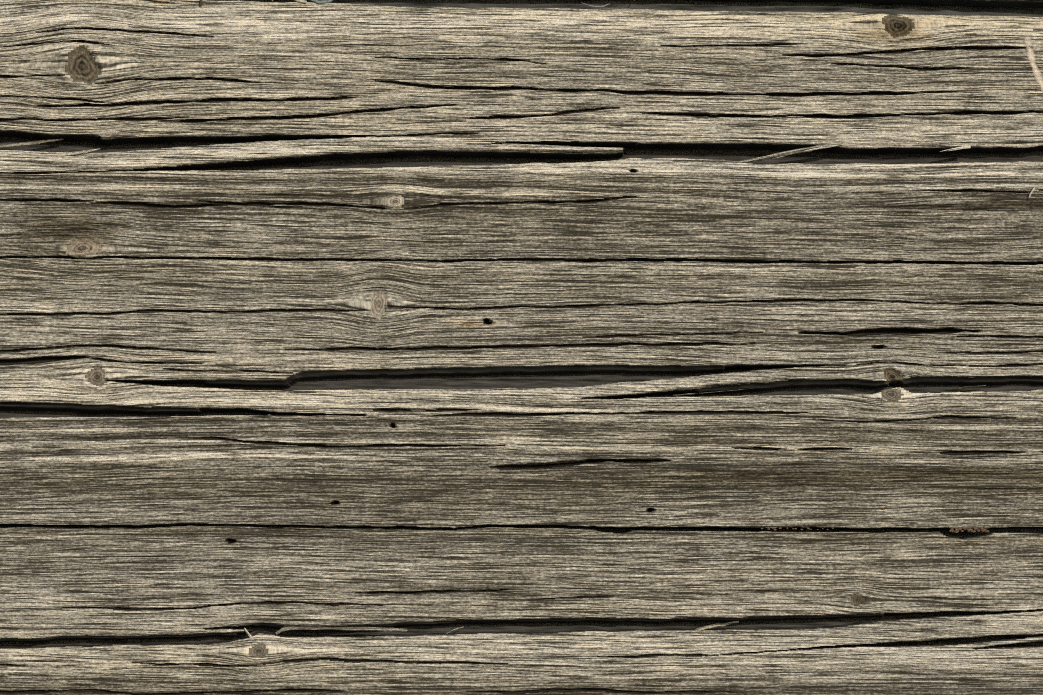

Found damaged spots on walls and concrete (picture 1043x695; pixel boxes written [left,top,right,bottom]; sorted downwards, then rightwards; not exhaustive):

crack [373,409,1016,423]
crack [178,437,671,470]
crack [731,445,852,453]
crack [940,449,1043,457]